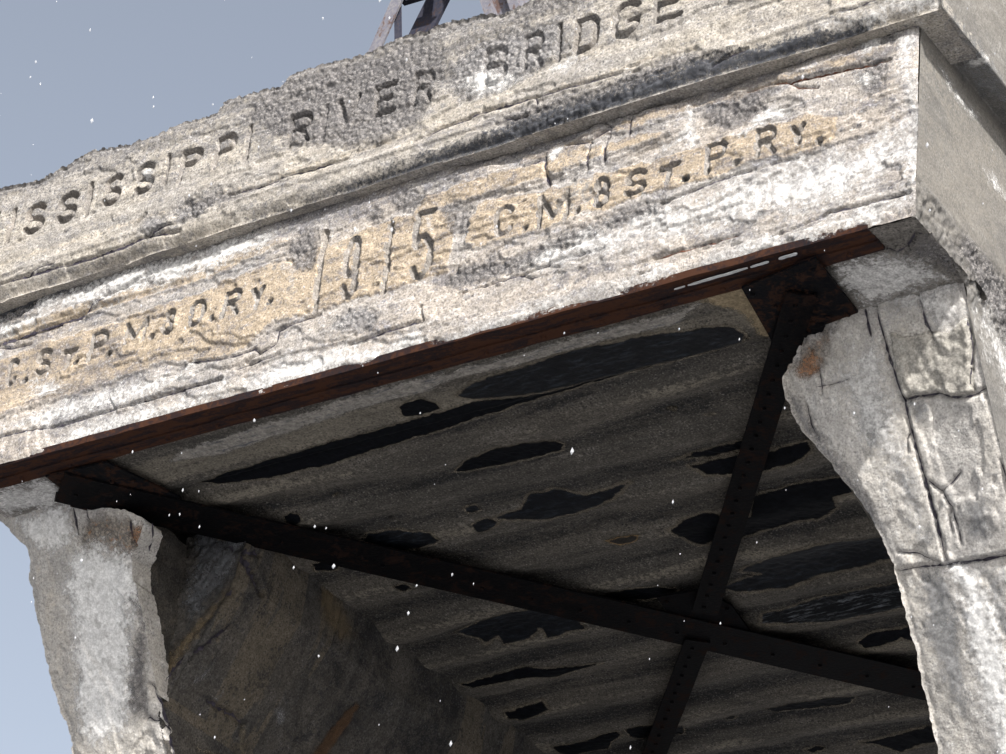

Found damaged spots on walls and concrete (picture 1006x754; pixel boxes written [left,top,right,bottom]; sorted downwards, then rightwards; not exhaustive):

crack [747,60,891,93]
crack [0,215,181,286]
rust [701,289,769,337]
crack [918,295,935,341]
crack [865,307,1006,571]